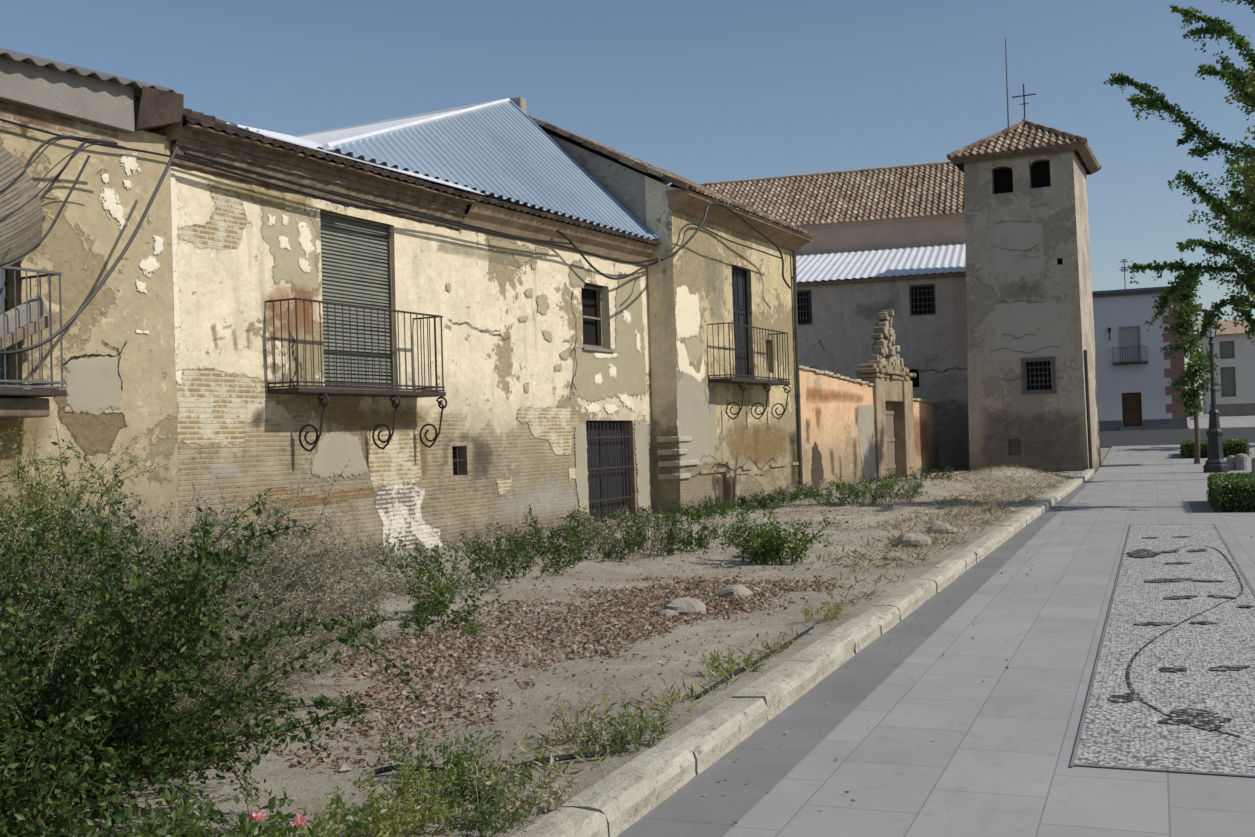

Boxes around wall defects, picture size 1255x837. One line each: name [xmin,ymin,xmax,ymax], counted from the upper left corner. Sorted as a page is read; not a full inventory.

flaking render [0,101,143,231]
peeling [136,235,165,294]
peeling [260,199,320,295]
crack [63,339,127,392]
crack [449,319,511,340]
peeling [676,341,705,382]
crack [994,300,1060,381]
spalling [54,396,127,456]
peeling [417,523,443,548]